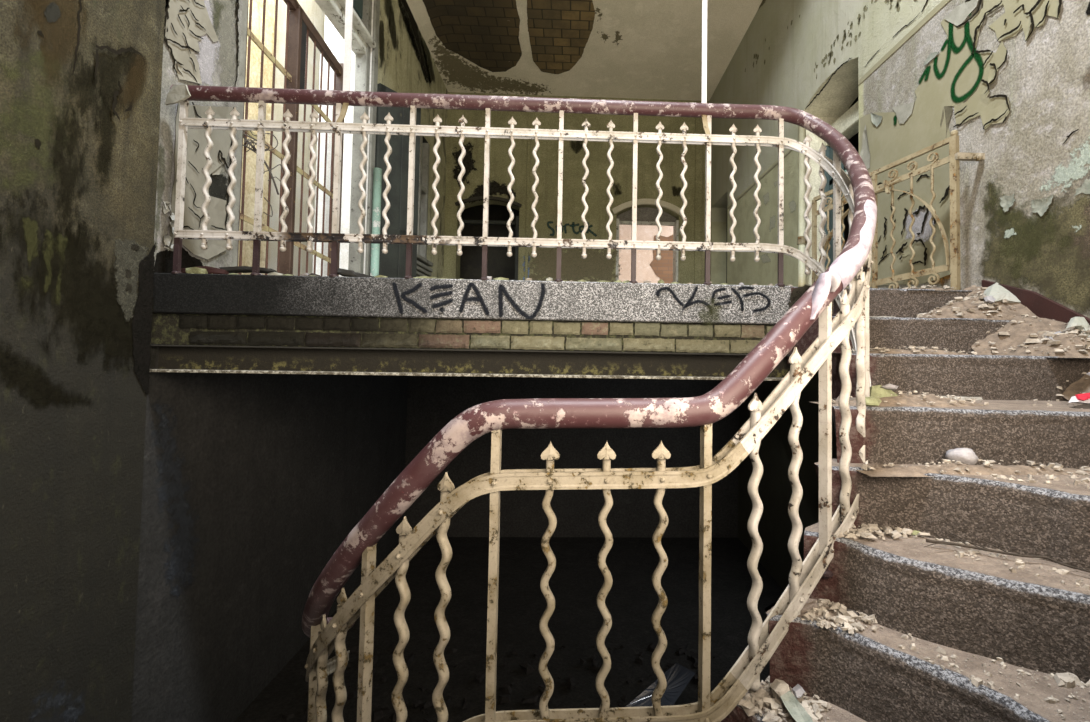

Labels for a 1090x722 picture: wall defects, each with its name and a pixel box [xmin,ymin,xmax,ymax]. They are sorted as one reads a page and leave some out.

flaking render [422,0,623,95]
peeling [814,0,901,79]
damp [0,67,136,370]
peeling [114,0,233,395]
peeling [829,0,1061,293]
peeling [1031,136,1090,217]
damp [0,346,90,408]